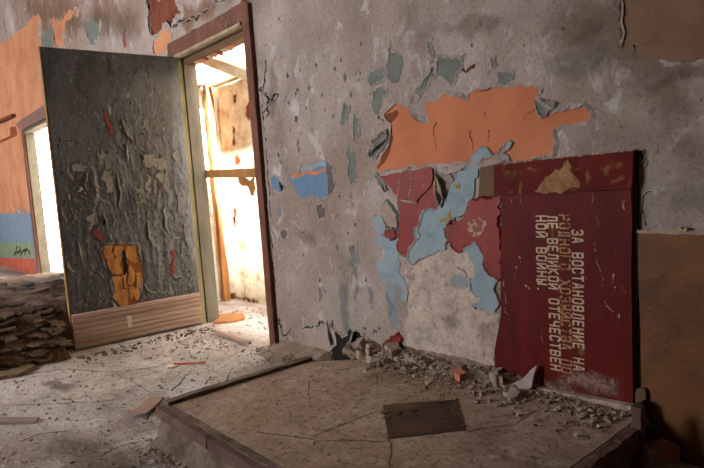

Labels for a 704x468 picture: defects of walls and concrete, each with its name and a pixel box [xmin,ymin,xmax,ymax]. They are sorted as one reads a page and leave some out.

flaking render [147,0,185,56]
peeling [619,0,704,68]
crack [259,60,279,300]
flaking render [271,158,340,221]
peeling [331,37,597,365]
crack [277,318,324,338]